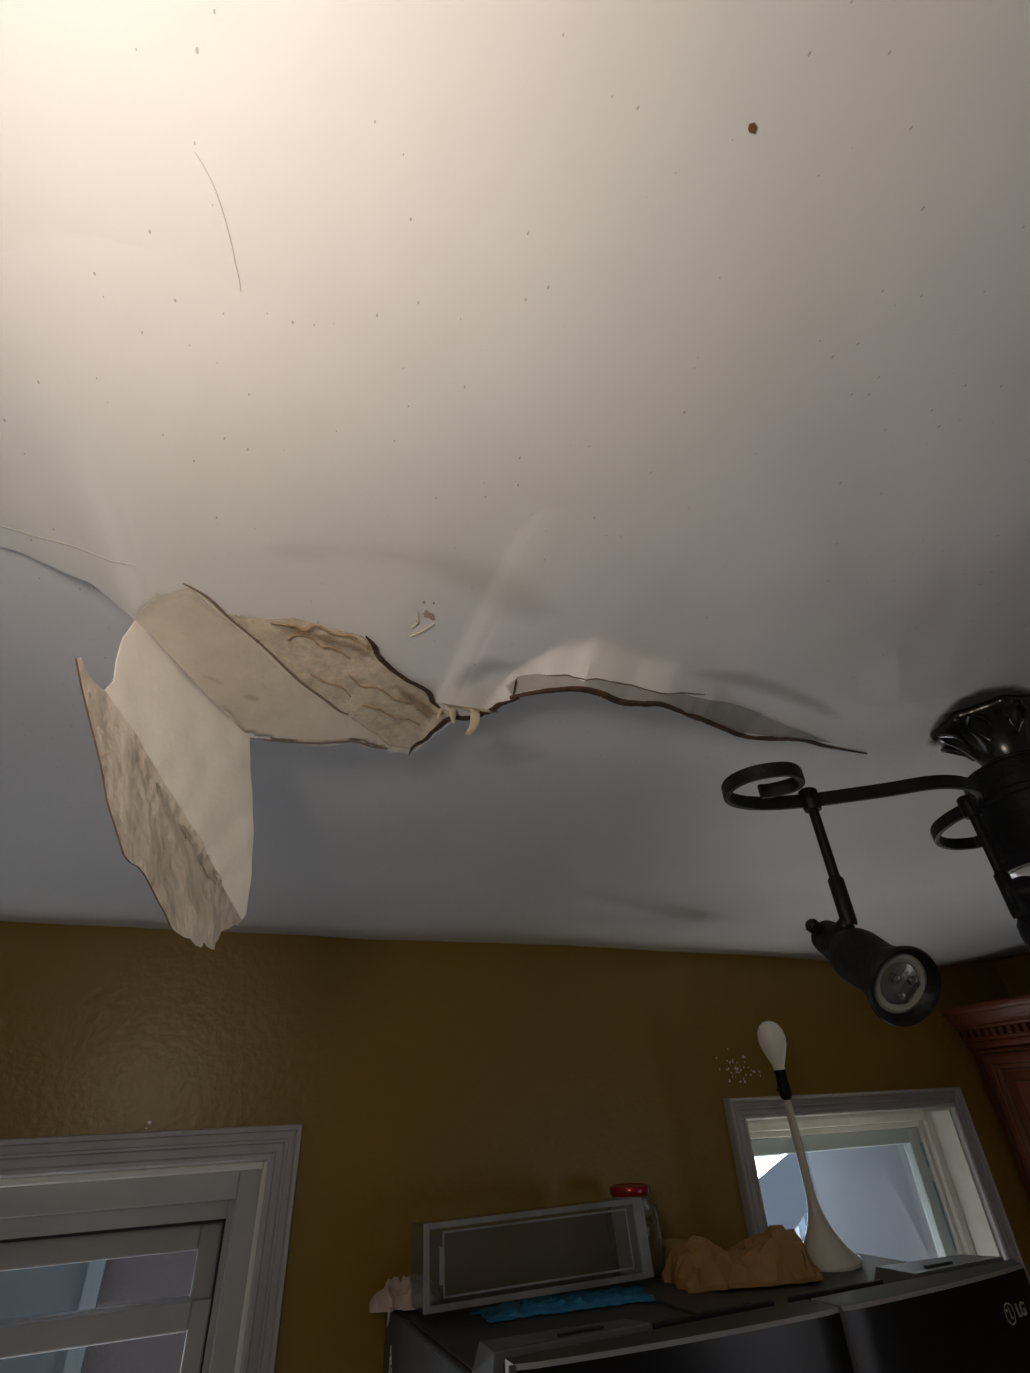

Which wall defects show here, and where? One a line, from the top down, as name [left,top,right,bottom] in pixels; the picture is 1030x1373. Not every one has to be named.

flaking render [230,614,498,749]
crack [183,583,867,755]
peeling [75,620,254,950]